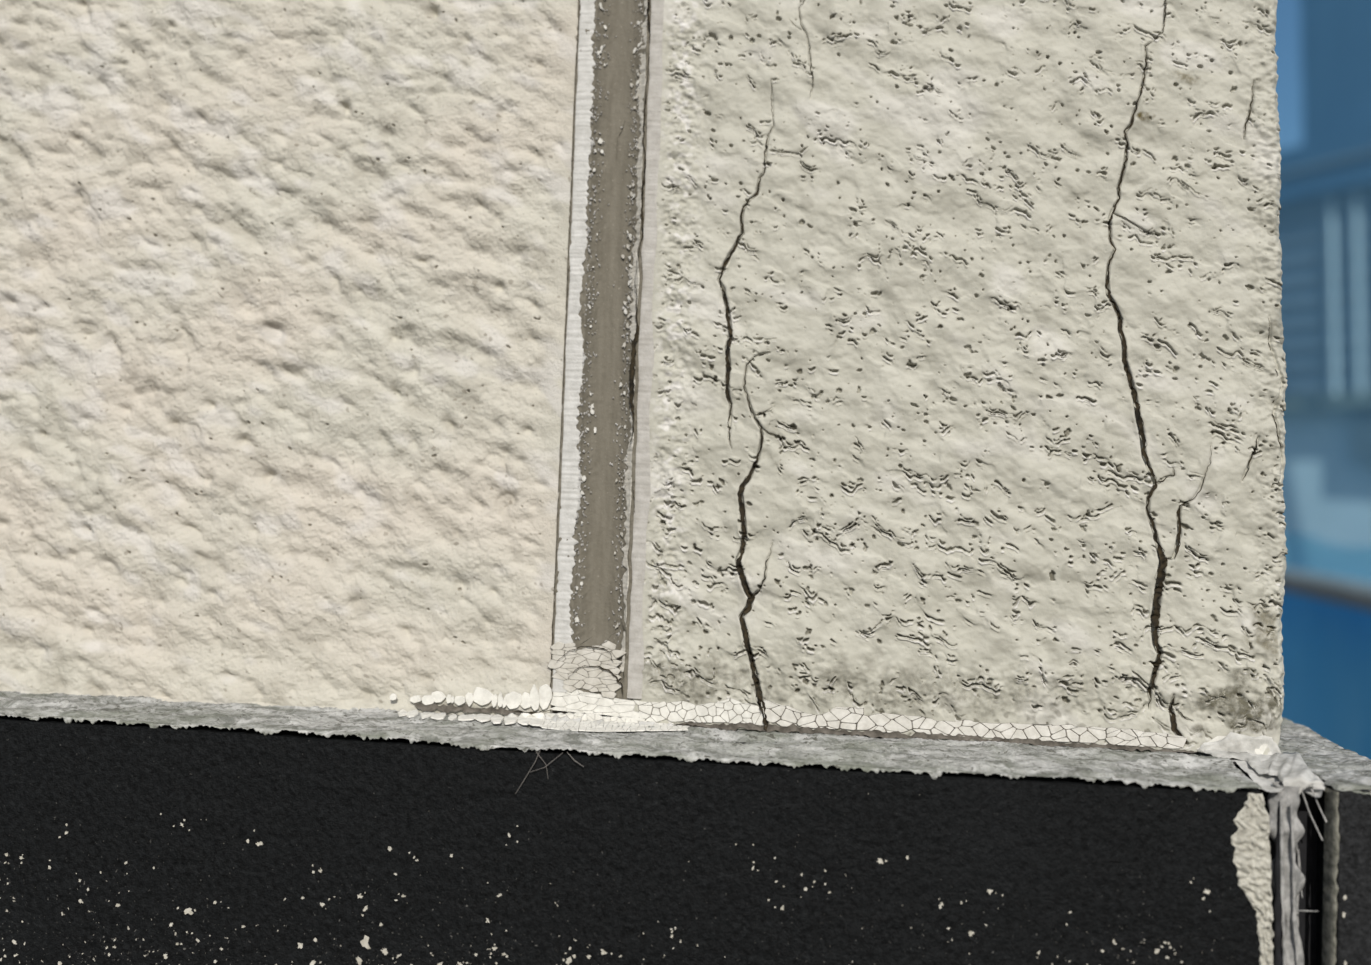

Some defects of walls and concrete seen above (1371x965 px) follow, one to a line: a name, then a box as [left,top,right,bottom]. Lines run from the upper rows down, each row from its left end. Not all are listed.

peeling [389,0,1325,794]
crack [672,0,1212,753]
crack [1242,327,1281,490]
spalling [356,923,412,965]
peeling [1231,793,1274,965]